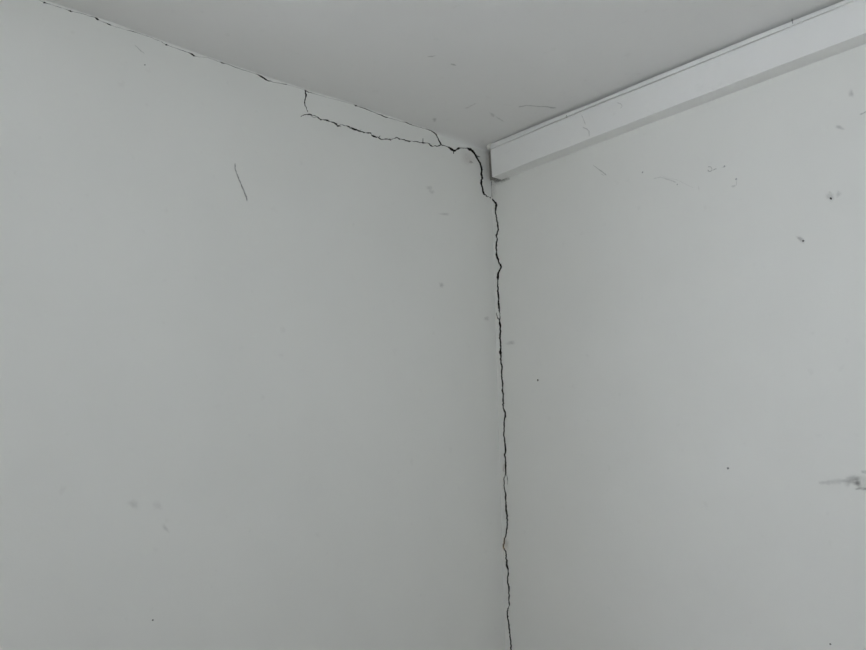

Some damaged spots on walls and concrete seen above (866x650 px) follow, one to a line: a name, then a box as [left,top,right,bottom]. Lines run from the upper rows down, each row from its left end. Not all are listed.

crack [43,2,512,650]